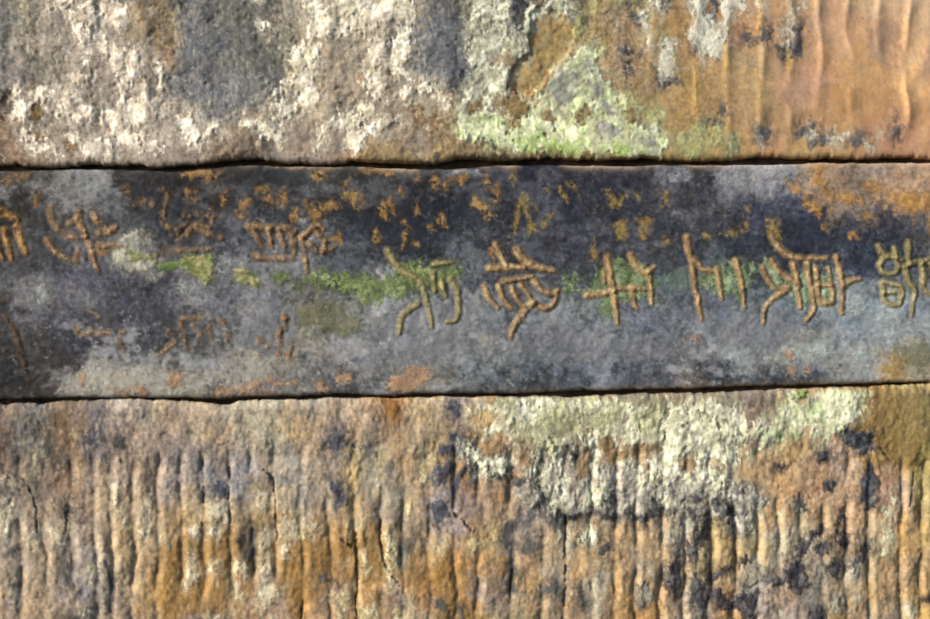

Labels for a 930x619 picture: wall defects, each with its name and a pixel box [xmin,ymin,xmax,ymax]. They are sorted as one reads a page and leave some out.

water stain [515,0,530,35]
water stain [10,0,225,164]
water stain [240,0,453,153]
water stain [112,229,157,272]
water stain [58,352,273,397]
water stain [347,449,359,495]
water stain [879,497,896,558]